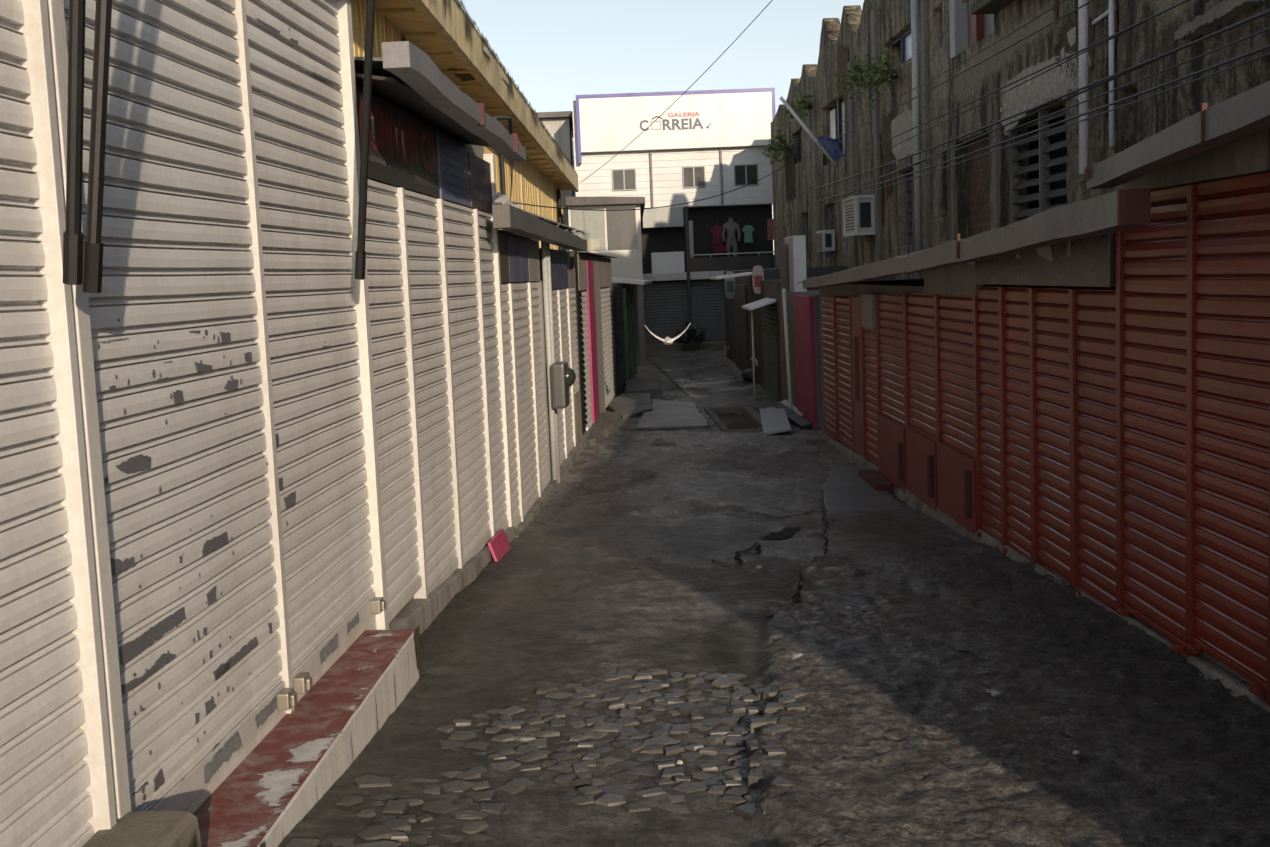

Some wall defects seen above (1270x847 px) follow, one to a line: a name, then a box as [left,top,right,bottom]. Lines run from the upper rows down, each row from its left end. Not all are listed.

peeling [152,361,184,404]
peeling [189,330,252,391]
peeling [104,454,151,484]
peeling [270,477,296,526]
peeling [110,554,143,576]
peeling [201,532,234,557]
peeling [206,586,222,606]
peeling [120,607,186,695]
spalling [393,625,422,674]
peeling [194,610,272,743]
peeling [131,769,165,801]
peeling [218,732,342,847]